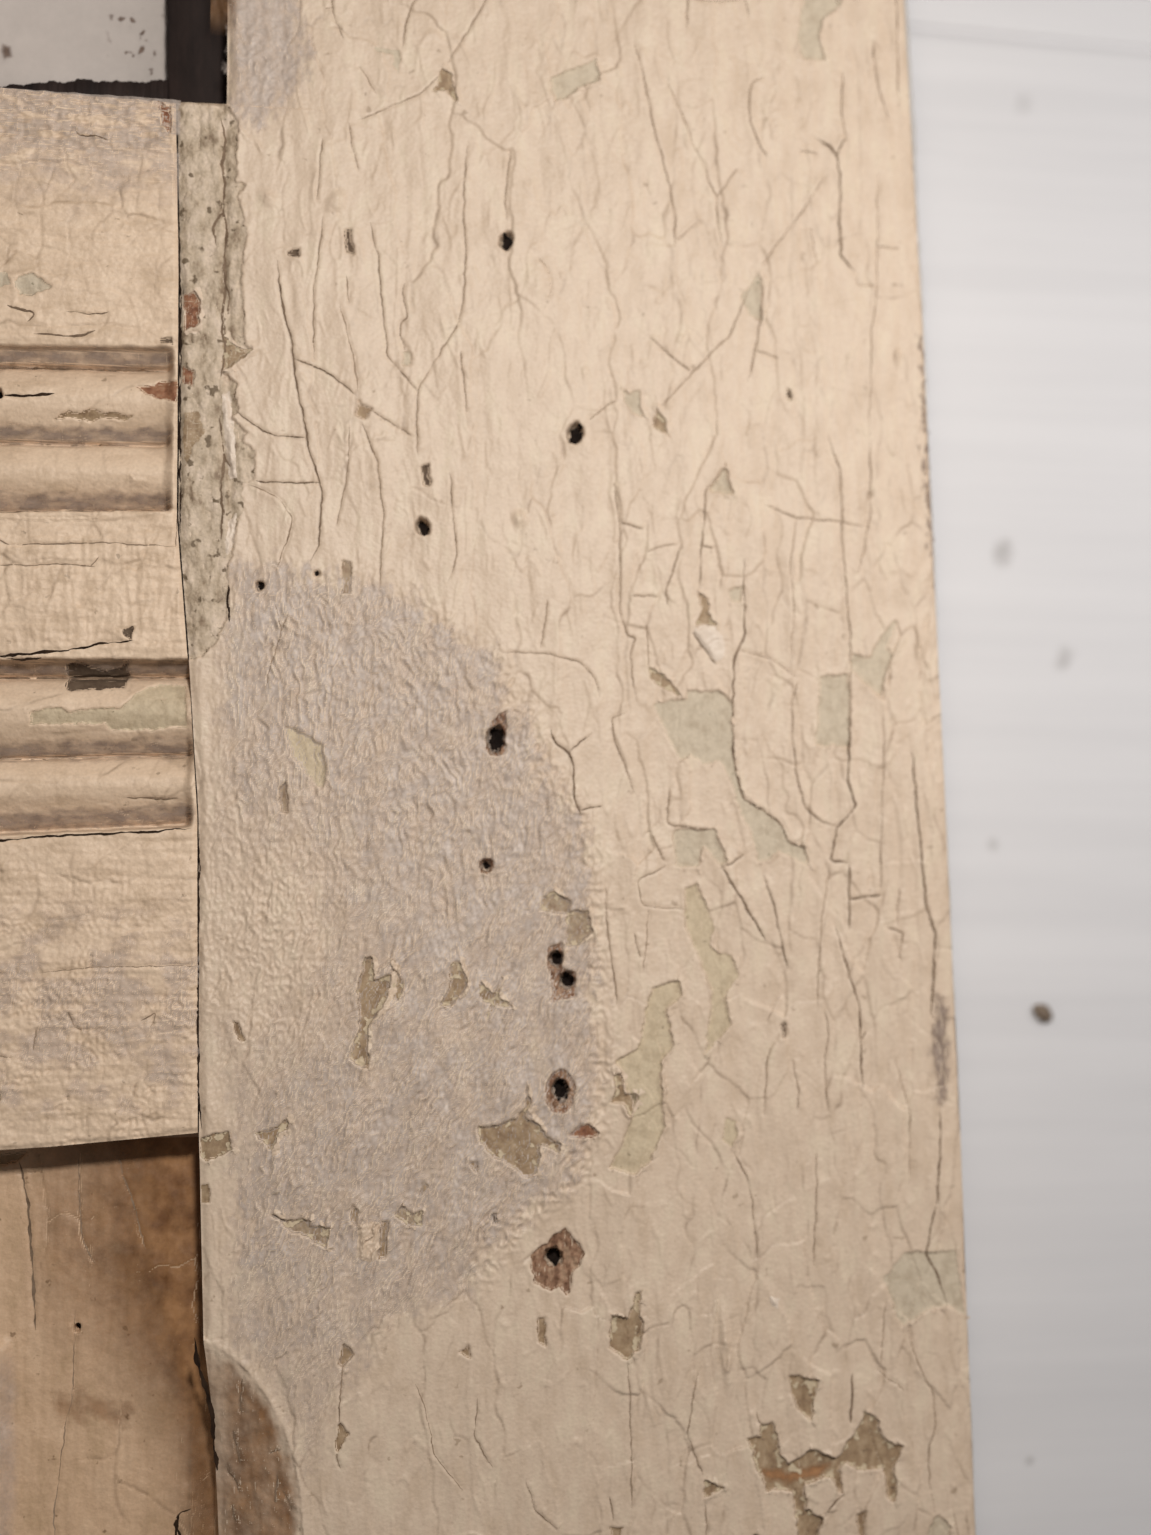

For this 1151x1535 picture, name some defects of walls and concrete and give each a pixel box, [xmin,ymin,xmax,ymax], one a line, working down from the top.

crack [0,120,230,567]
peeling [137,102,261,659]
crack [219,0,486,584]
crack [0,640,176,680]
peeling [29,662,187,731]
crack [503,0,956,1303]
peeling [346,954,405,1071]
peeling [471,1080,606,1179]
crack [19,1162,36,1330]
peeling [609,1290,651,1364]
crack [193,1338,292,1522]
peeling [748,1373,909,1535]